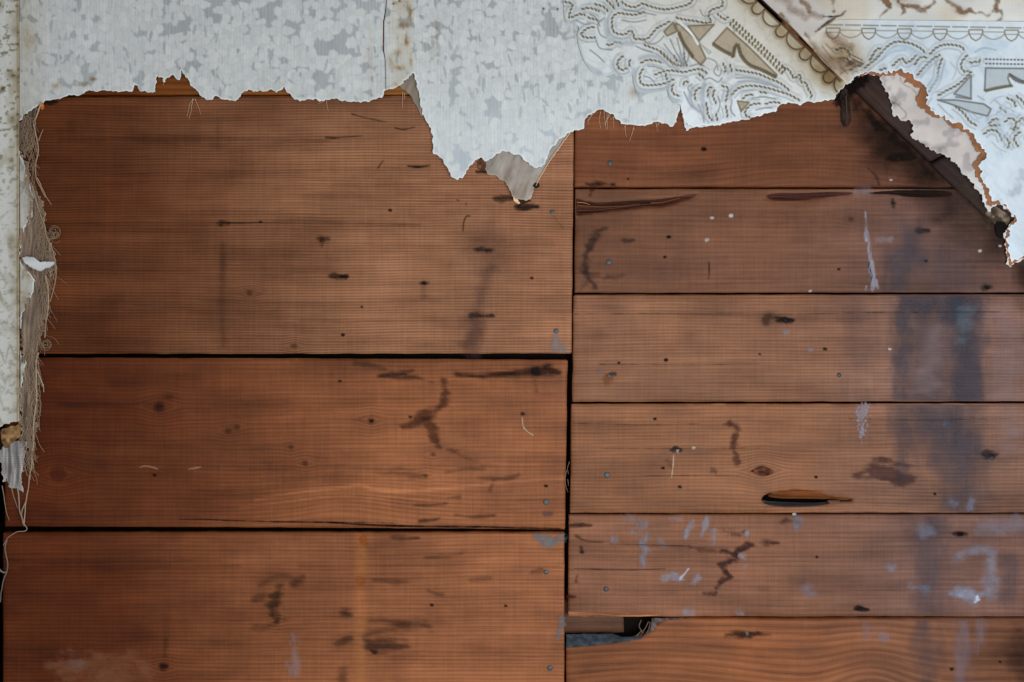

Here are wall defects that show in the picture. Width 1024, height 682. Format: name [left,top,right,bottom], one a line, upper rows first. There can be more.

spalling [576,194,696,215]
spalling [767,192,852,201]
flaking render [985,207,1010,238]
leakage [855,457,915,486]